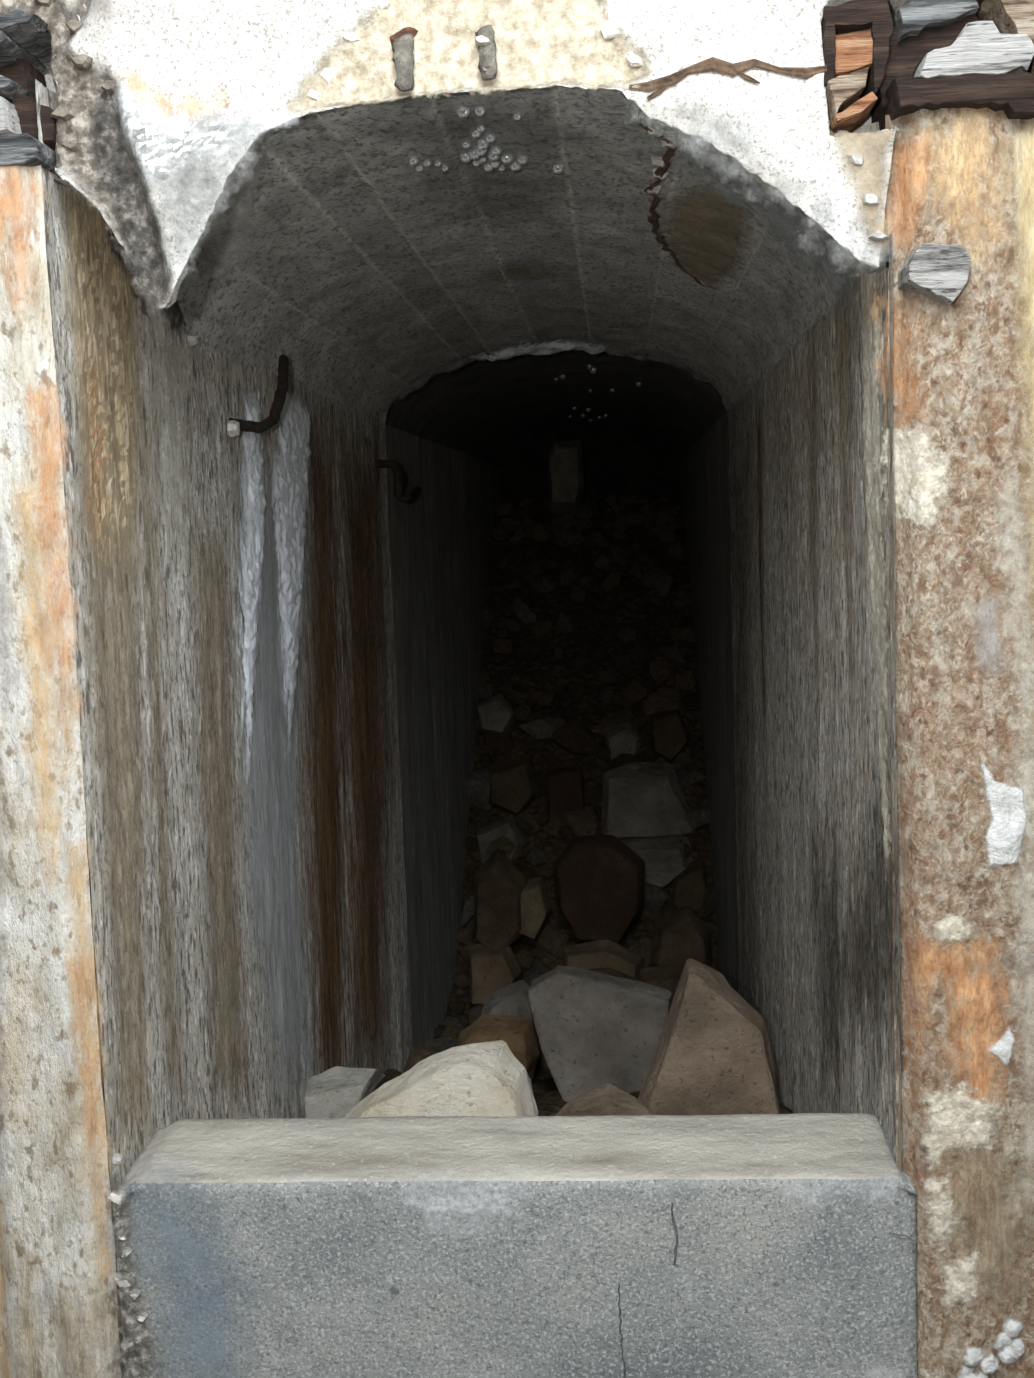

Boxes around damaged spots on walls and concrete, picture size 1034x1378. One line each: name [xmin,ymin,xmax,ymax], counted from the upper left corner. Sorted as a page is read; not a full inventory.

spalling [0,0,198,346]
crack [629,57,827,126]
corrosion [889,123,988,242]
corrosion [1016,132,1034,440]
corrosion [21,391,69,832]
corrosion [911,940,1003,1104]
crack [670,1203,678,1265]
efflorescence [919,1082,1001,1305]
efflorescence [921,1319,1025,1378]